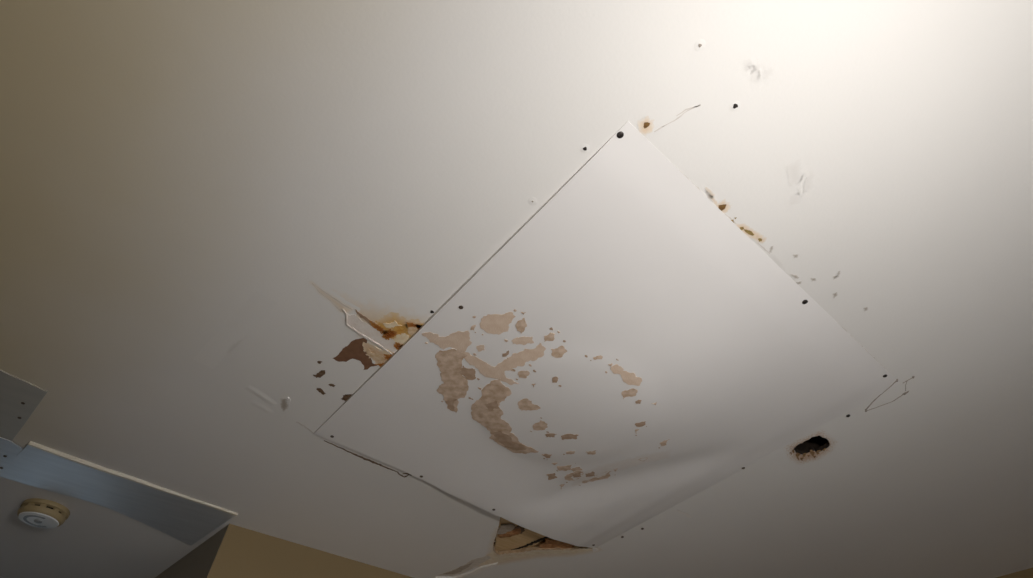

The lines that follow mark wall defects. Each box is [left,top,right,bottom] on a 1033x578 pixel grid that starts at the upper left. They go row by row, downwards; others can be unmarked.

rust [637,116,654,136]
rust [705,187,767,244]
rust [369,320,421,367]
peeling [313,309,618,489]
hole [783,429,838,465]
spalling [480,517,598,566]